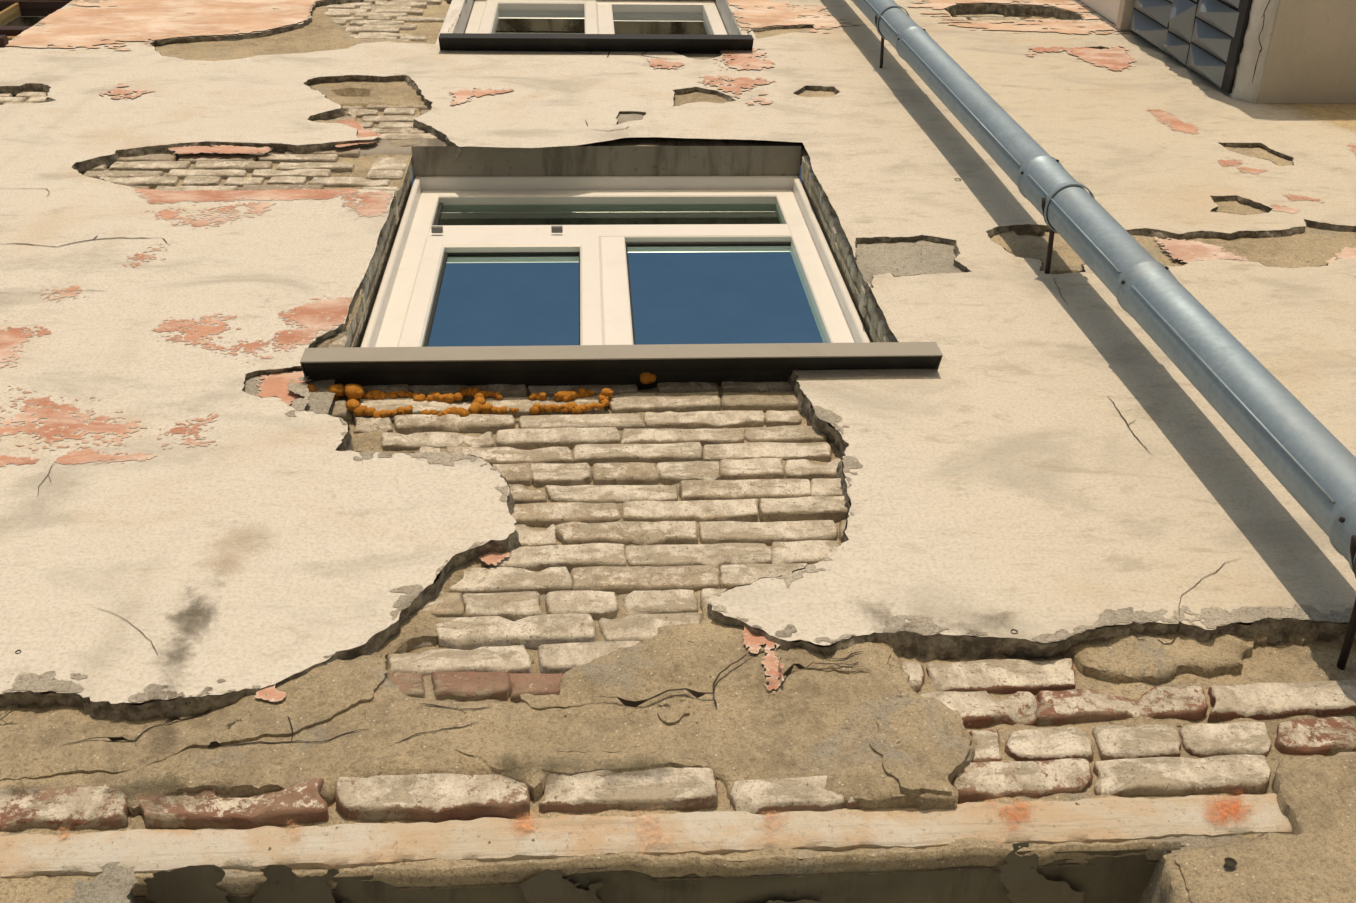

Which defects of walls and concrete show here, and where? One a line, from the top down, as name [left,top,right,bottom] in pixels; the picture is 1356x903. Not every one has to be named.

peeling [6,0,467,61]
crack [1252,0,1270,82]
spalling [0,83,55,105]
peeling [449,87,514,105]
spalling [72,75,461,229]
spalling [845,235,972,299]
spalling [986,224,1086,274]
spalling [1126,193,1356,268]
spalling [0,289,1356,903]
crack [599,646,862,709]
crack [64,709,366,749]
crack [397,703,493,743]